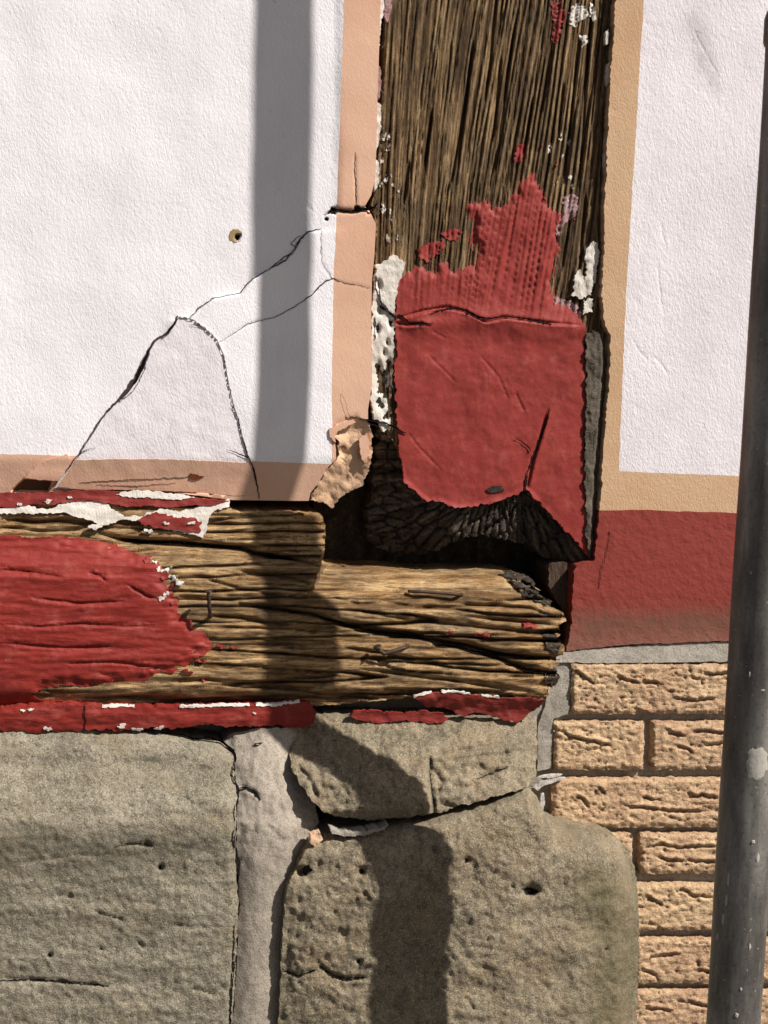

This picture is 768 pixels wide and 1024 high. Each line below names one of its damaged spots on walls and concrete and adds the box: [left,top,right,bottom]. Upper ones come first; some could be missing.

peeling [550,0,596,48]
peeling [380,133,400,193]
peeling [355,202,398,243]
peeling [416,227,462,263]
peeling [554,175,585,245]
crack [53,155,551,495]
peeling [554,296,582,319]
spalling [375,359,396,419]
spalling [309,416,373,508]
peeling [151,560,184,601]
peeling [413,689,545,723]